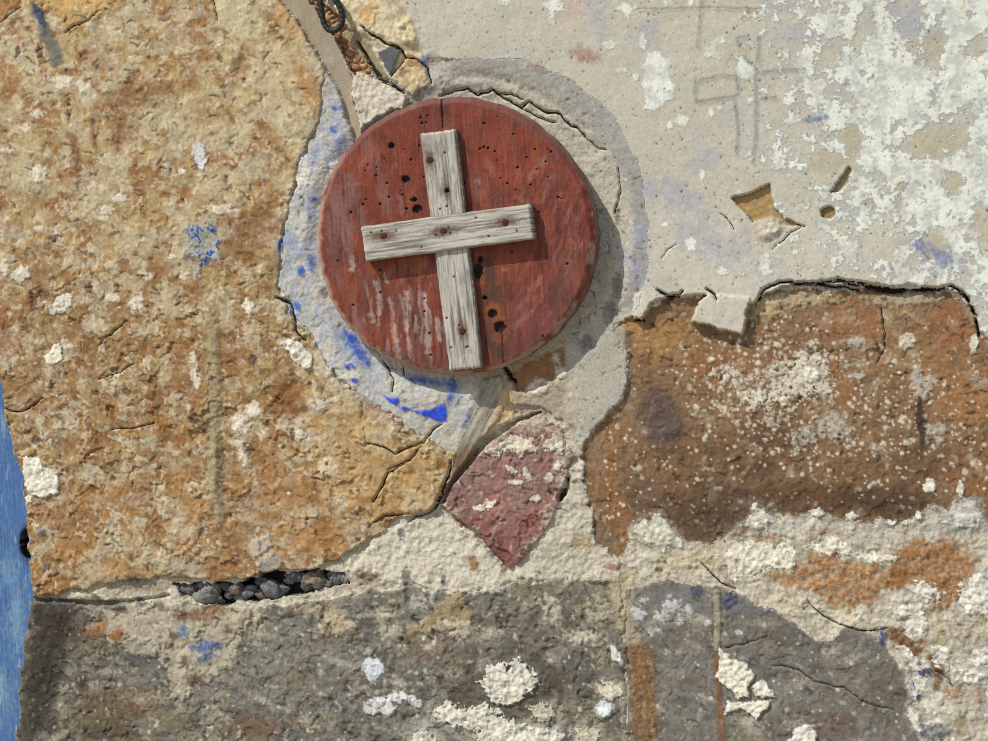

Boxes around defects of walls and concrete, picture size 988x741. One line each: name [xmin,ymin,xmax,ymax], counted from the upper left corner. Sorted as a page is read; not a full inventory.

peeling [542,0,565,27]
peeling [616,2,638,19]
peeling [616,33,676,111]
crack [359,26,622,212]
peeling [667,113,690,130]
peeling [733,0,988,338]
peeling [685,237,697,252]
crack [367,424,452,528]